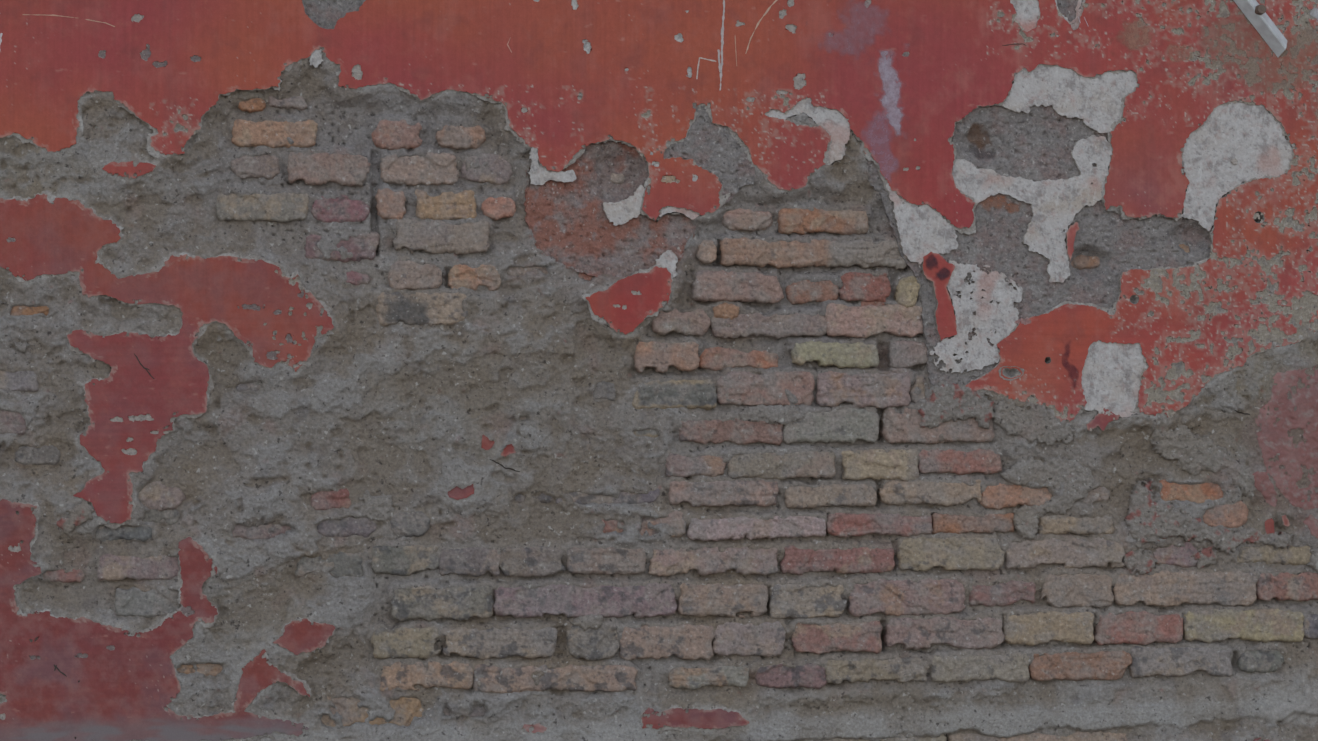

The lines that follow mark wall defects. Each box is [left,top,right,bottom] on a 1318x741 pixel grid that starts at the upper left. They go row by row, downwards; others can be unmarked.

spalling [302,0,366,29]
peeling [1186,0,1273,87]
peeling [1001,65,1138,134]
spalling [952,105,1107,182]
peeling [603,185,645,226]
peeling [952,159,1079,207]
peeling [1246,193,1318,253]
peeling [983,304,1019,344]
peeling [1165,329,1214,354]
peeling [1172,263,1238,321]
peeling [1209,245,1290,282]
peeling [1247,278,1318,352]